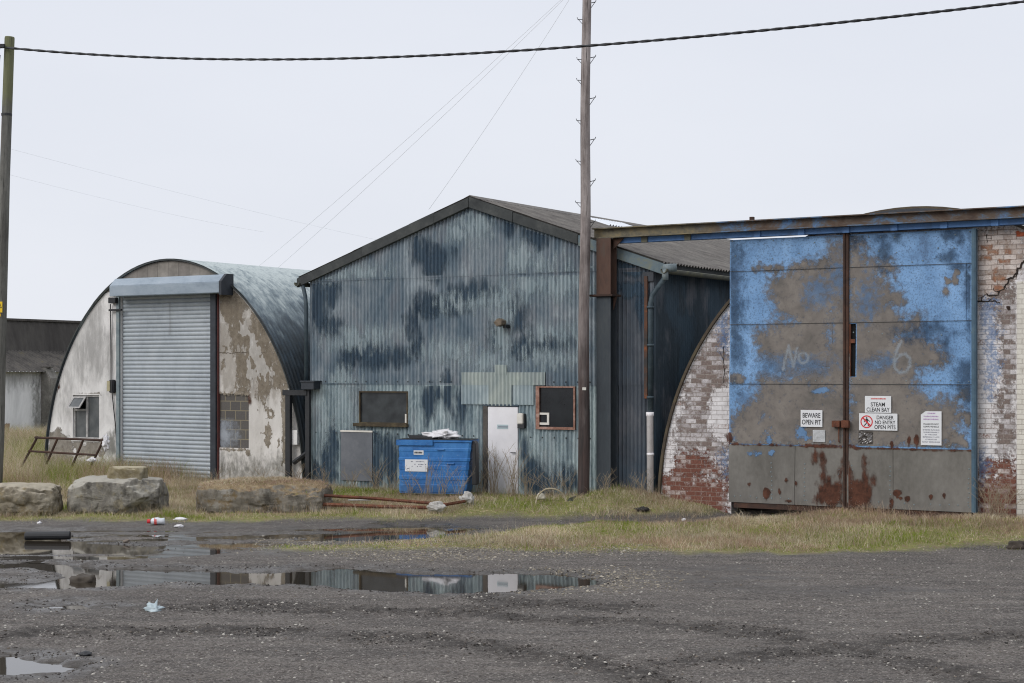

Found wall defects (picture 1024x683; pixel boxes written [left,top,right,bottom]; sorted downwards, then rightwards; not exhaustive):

leakage [447,211,494,247]
peeling [219,290,287,448]
leakage [319,366,364,450]
leakage [316,323,402,353]
leakage [326,263,396,284]
leakage [422,243,595,372]
peeling [661,226,1024,518]
crack [978,260,1024,304]
corrosion [726,432,971,511]